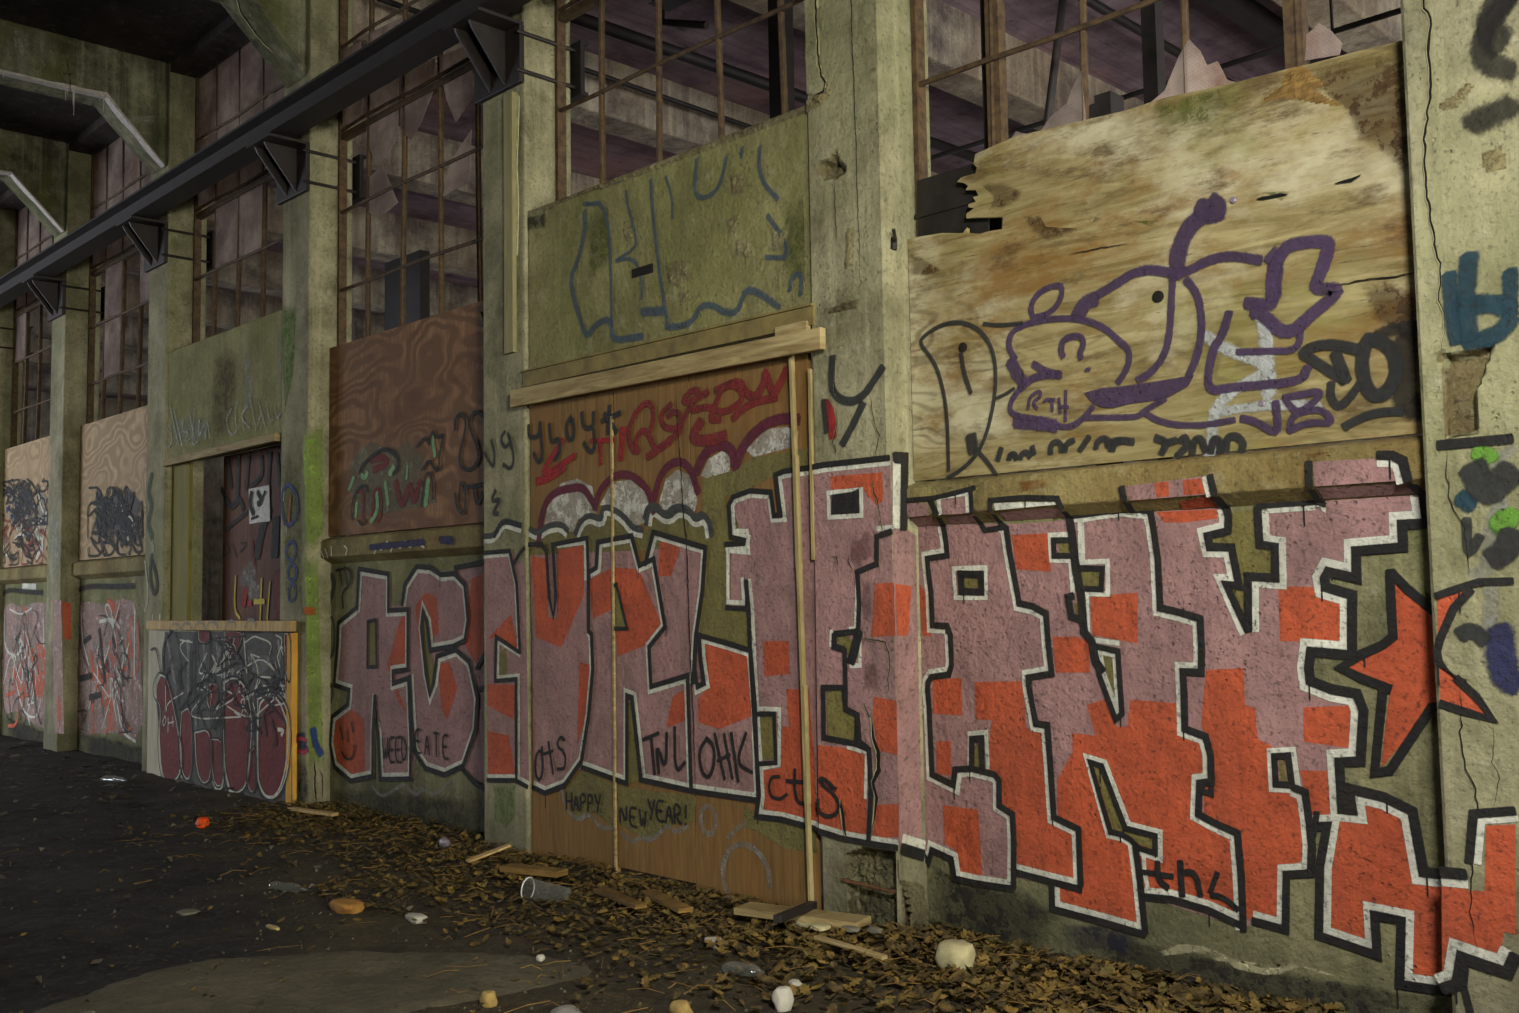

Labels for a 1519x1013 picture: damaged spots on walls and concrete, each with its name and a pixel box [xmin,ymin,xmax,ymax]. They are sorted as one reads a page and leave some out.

spalling [516,81,830,255]
spalling [816,149,846,180]
crack [802,0,861,294]
crack [1257,192,1288,200]
crack [1334,0,1445,350]
spalling [1438,346,1493,440]
crack [1445,461,1469,566]
leakage [285,430,323,801]